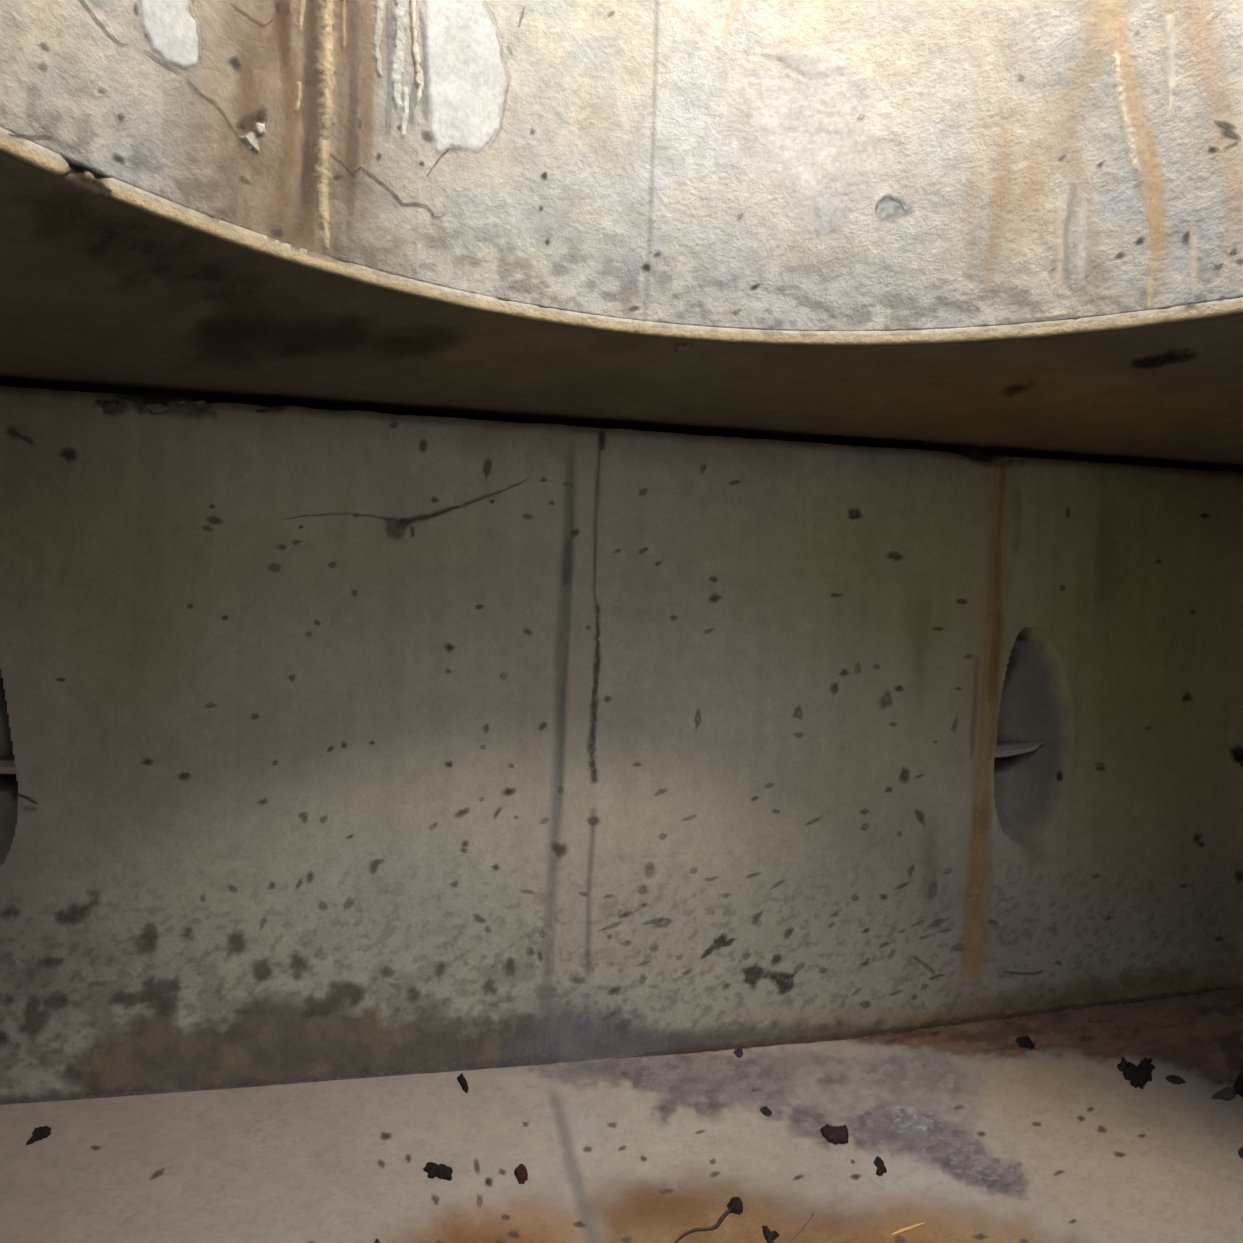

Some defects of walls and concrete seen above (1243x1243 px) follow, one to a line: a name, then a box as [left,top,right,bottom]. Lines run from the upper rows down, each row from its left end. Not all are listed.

peeling [141,0,202,67]
peeling [424,0,510,152]
corrosion [231,0,371,258]
crack [288,480,526,539]
damp [65,491,876,1094]
damp [57,900,97,924]
damp [22,995,68,1035]